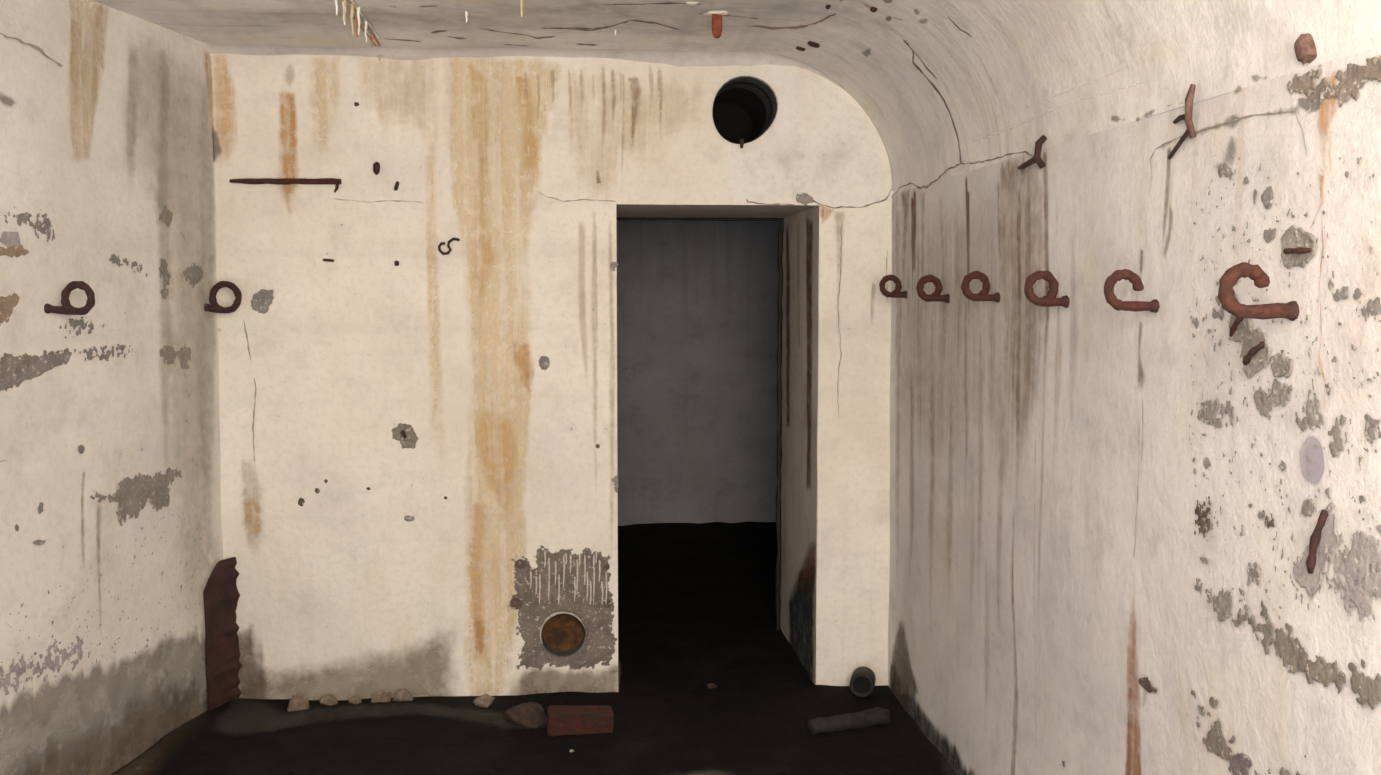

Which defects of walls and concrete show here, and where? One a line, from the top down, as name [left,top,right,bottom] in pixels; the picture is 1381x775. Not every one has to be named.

corrosion [212,119,226,159]
crack [1111,111,1307,192]
peeling [0,293,19,326]
peeling [0,316,133,392]
peeling [1189,155,1381,710]
peeling [508,545,617,670]
water stain [0,636,207,775]
water stain [238,631,447,700]
water stain [890,625,972,775]
corrosion [1129,635,1137,700]
corrosion [1126,717,1141,775]
peeling [1191,690,1306,775]